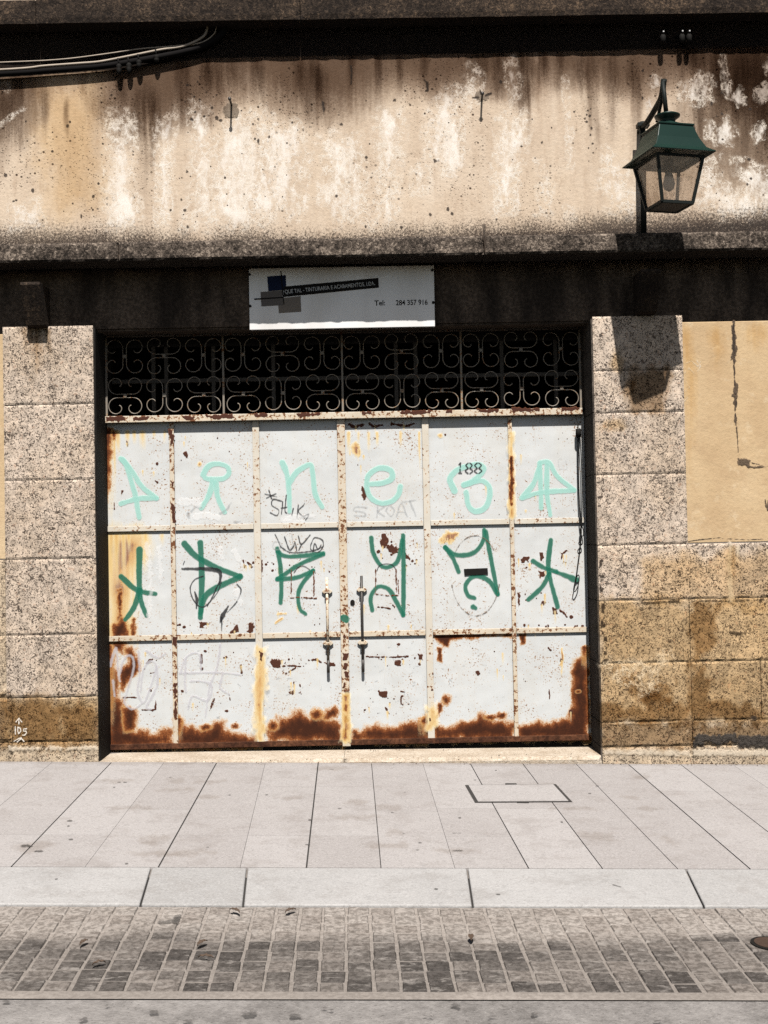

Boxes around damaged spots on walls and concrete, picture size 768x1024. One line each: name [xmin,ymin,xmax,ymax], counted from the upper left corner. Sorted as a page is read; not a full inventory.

leakage [0,193,768,244]
crack [731,320,739,452]
corrosion [507,432,515,519]
corrosion [108,531,592,752]